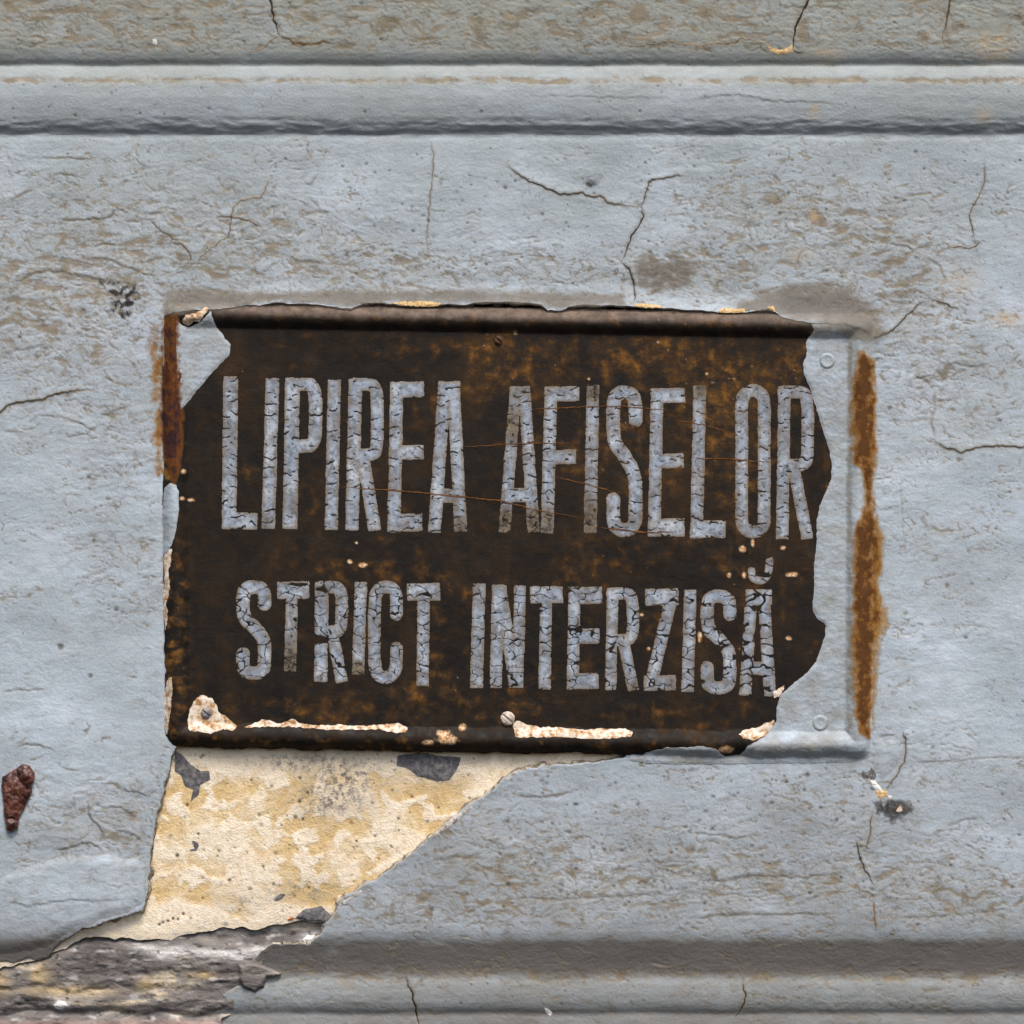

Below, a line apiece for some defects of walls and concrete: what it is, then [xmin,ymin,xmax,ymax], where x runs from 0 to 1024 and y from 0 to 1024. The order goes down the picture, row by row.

crack [616,0,809,55]
crack [510,168,687,303]
crack [945,170,986,249]
rust [150,315,184,484]
crack [936,442,1023,453]
rust [850,351,889,739]
spalling [0,311,912,1024]
crack [856,733,907,930]